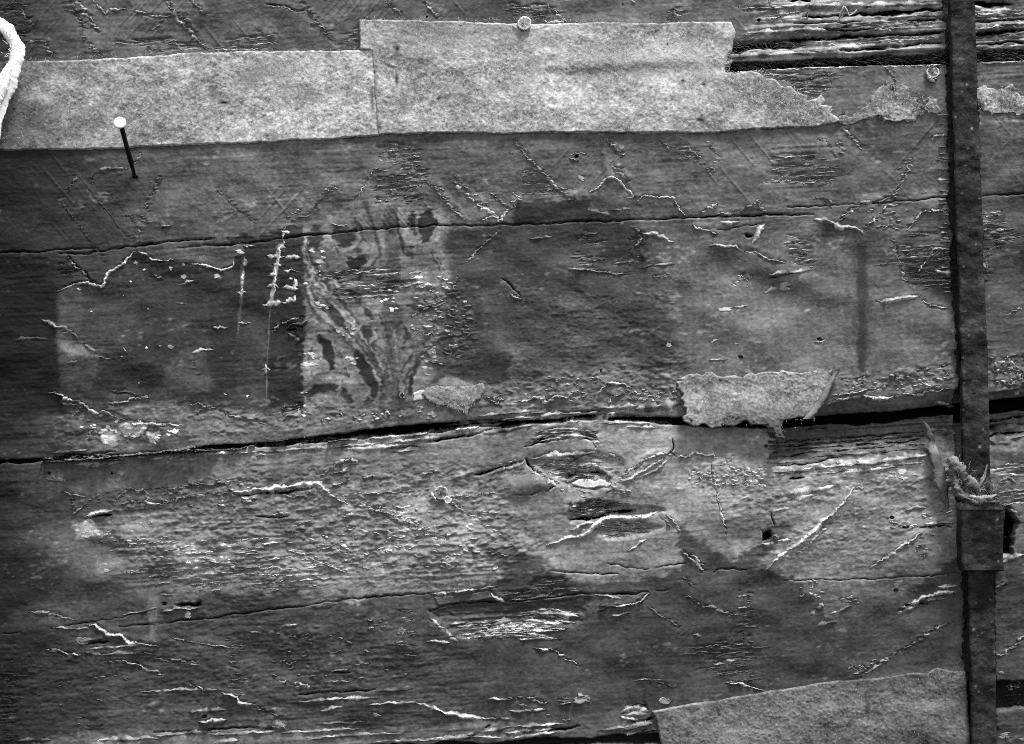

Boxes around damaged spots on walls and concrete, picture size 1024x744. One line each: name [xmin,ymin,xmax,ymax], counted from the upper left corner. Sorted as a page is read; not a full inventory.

crack [872,196,945,204]
crack [0,205,830,255]
peeling [413,390,437,420]
peeling [568,440,929,572]
water stain [859,623,951,677]